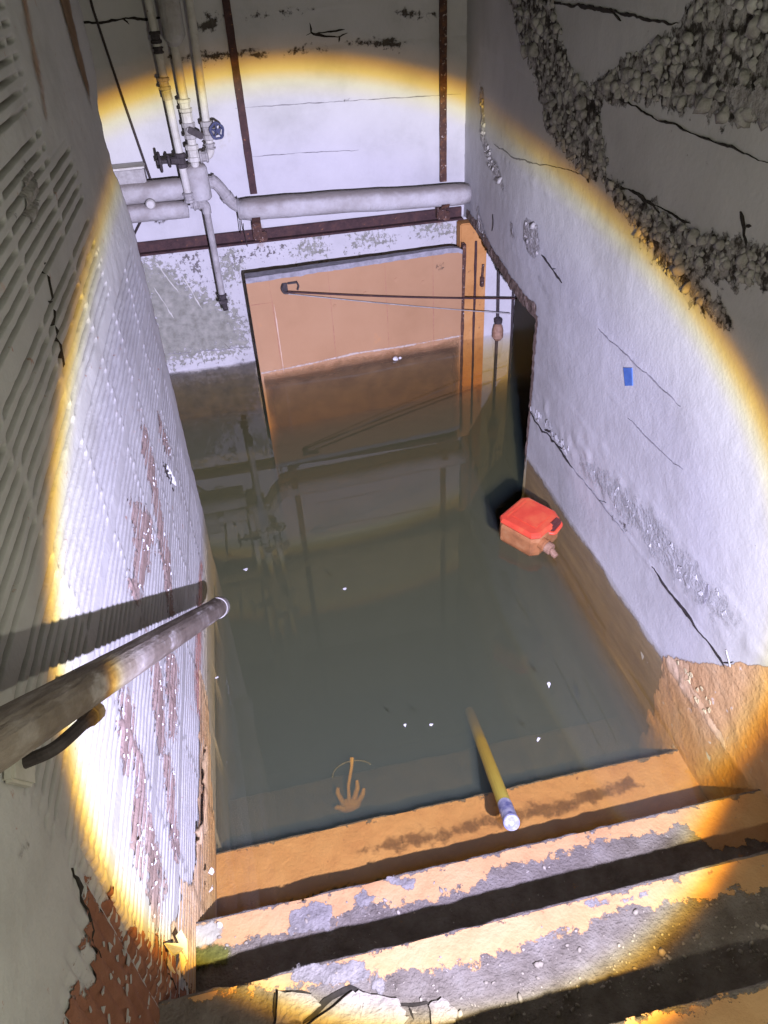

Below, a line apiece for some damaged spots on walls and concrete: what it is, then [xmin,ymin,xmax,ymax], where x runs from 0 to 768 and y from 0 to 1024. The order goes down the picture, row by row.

crack [83,16,160,24]
crack [544,0,677,26]
crack [613,95,768,163]
flaking render [510,0,768,311]
crack [607,178,690,224]
crack [652,567,732,668]
peeling [665,656,726,750]
peeling [515,777,636,820]
peeling [63,651,218,1024]
peeling [382,816,504,852]
peeling [291,960,386,996]
crack [400,1001,430,1020]